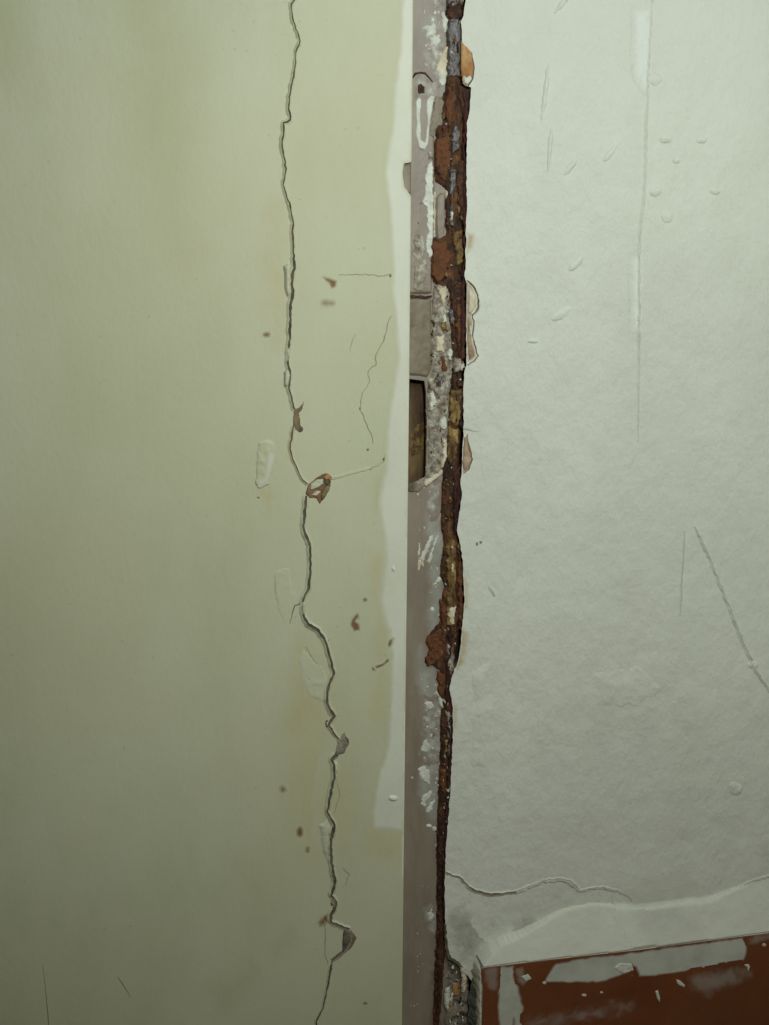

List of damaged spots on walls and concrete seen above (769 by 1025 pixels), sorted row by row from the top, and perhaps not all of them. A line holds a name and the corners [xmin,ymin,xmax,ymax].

crack [278,0,392,1025]
rust [408,477,425,492]
spalling [417,899,469,1025]
peeling [411,0,481,831]
rust [425,0,471,1025]
crack [445,870,632,902]